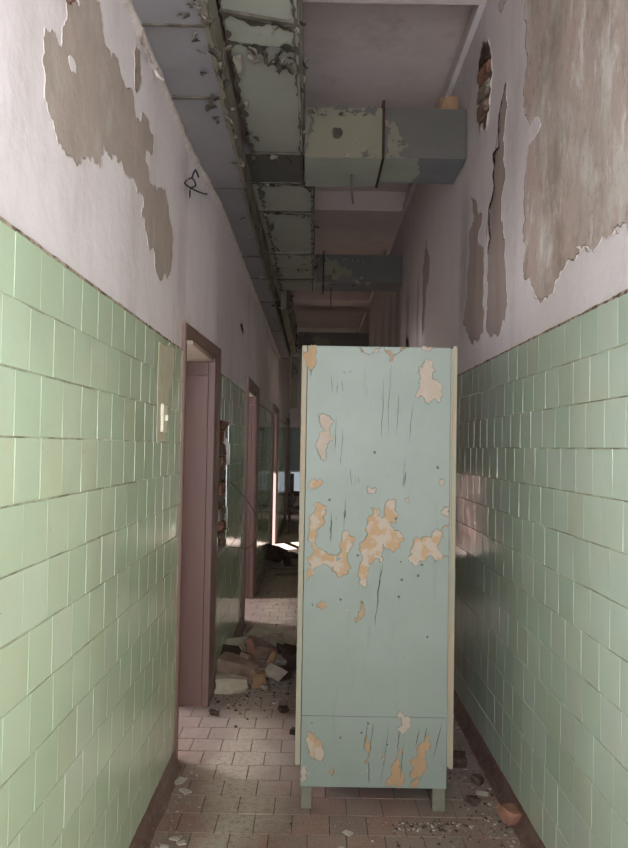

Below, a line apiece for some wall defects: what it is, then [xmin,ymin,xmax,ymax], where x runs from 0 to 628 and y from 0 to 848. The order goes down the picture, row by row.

flaking render [41,0,173,282]
peeling [205,94,249,138]
peeling [192,38,308,88]
peeling [332,127,343,139]
flaking render [463,38,508,345]
flaking render [523,0,628,303]
spalling [217,420,231,546]